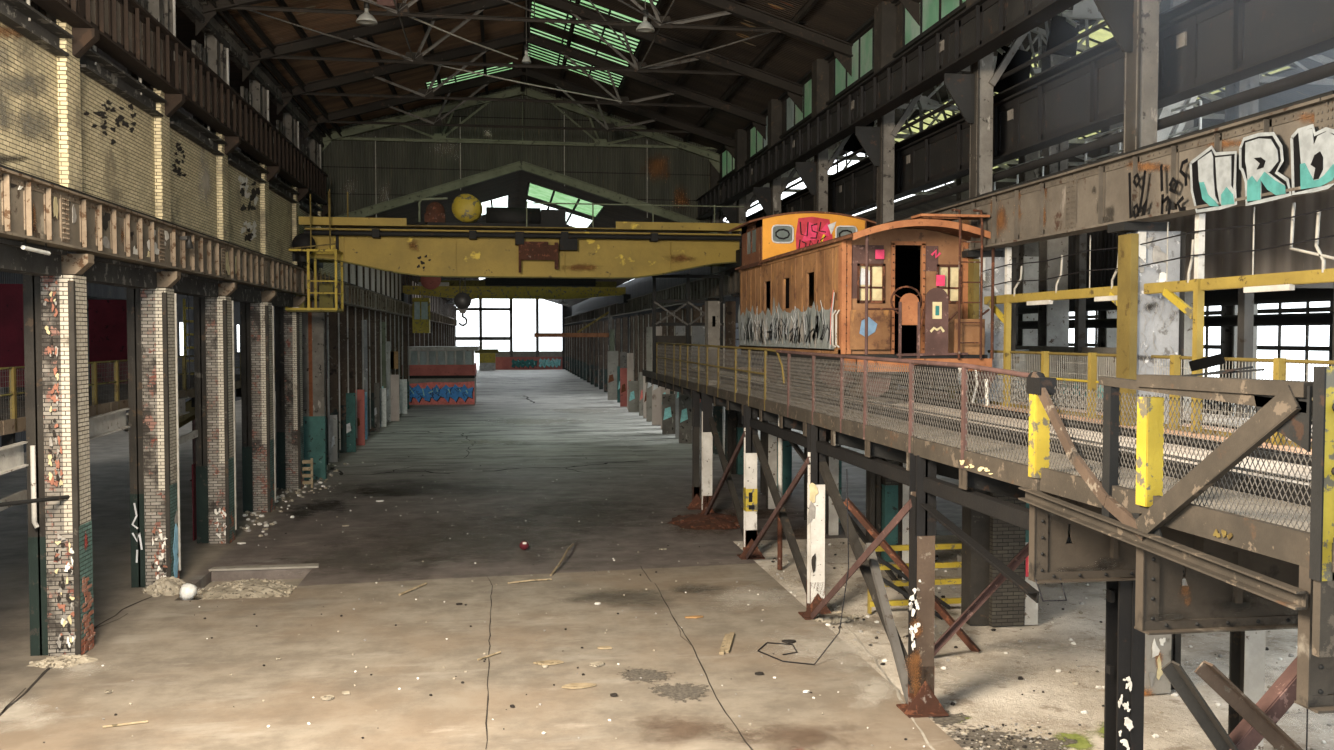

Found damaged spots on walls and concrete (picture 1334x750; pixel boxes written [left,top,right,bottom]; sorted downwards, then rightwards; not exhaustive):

spalling [43,281,63,487]
peeling [54,533,96,653]
crack [641,567,753,750]